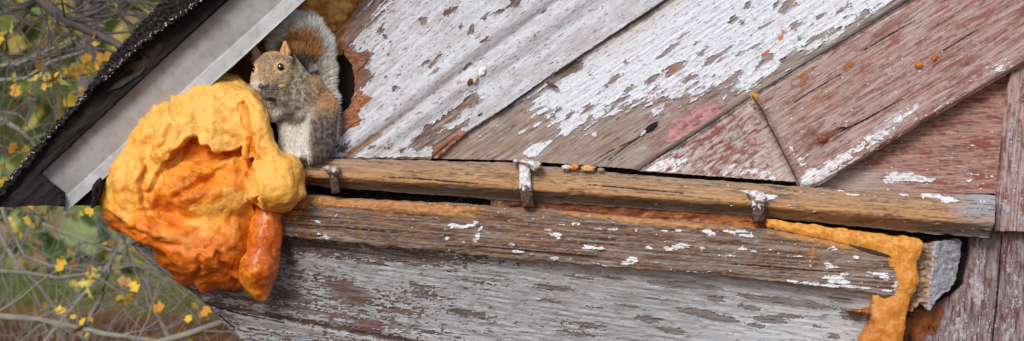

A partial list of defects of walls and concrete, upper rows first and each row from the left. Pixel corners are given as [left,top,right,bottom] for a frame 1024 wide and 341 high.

peeling [459,0,521,43]
peeling [332,0,483,160]
peeling [518,0,906,158]
peeling [645,142,713,173]
peeling [543,222,618,267]
peeling [185,199,532,341]
peeling [527,263,626,303]
peeling [540,318,607,338]